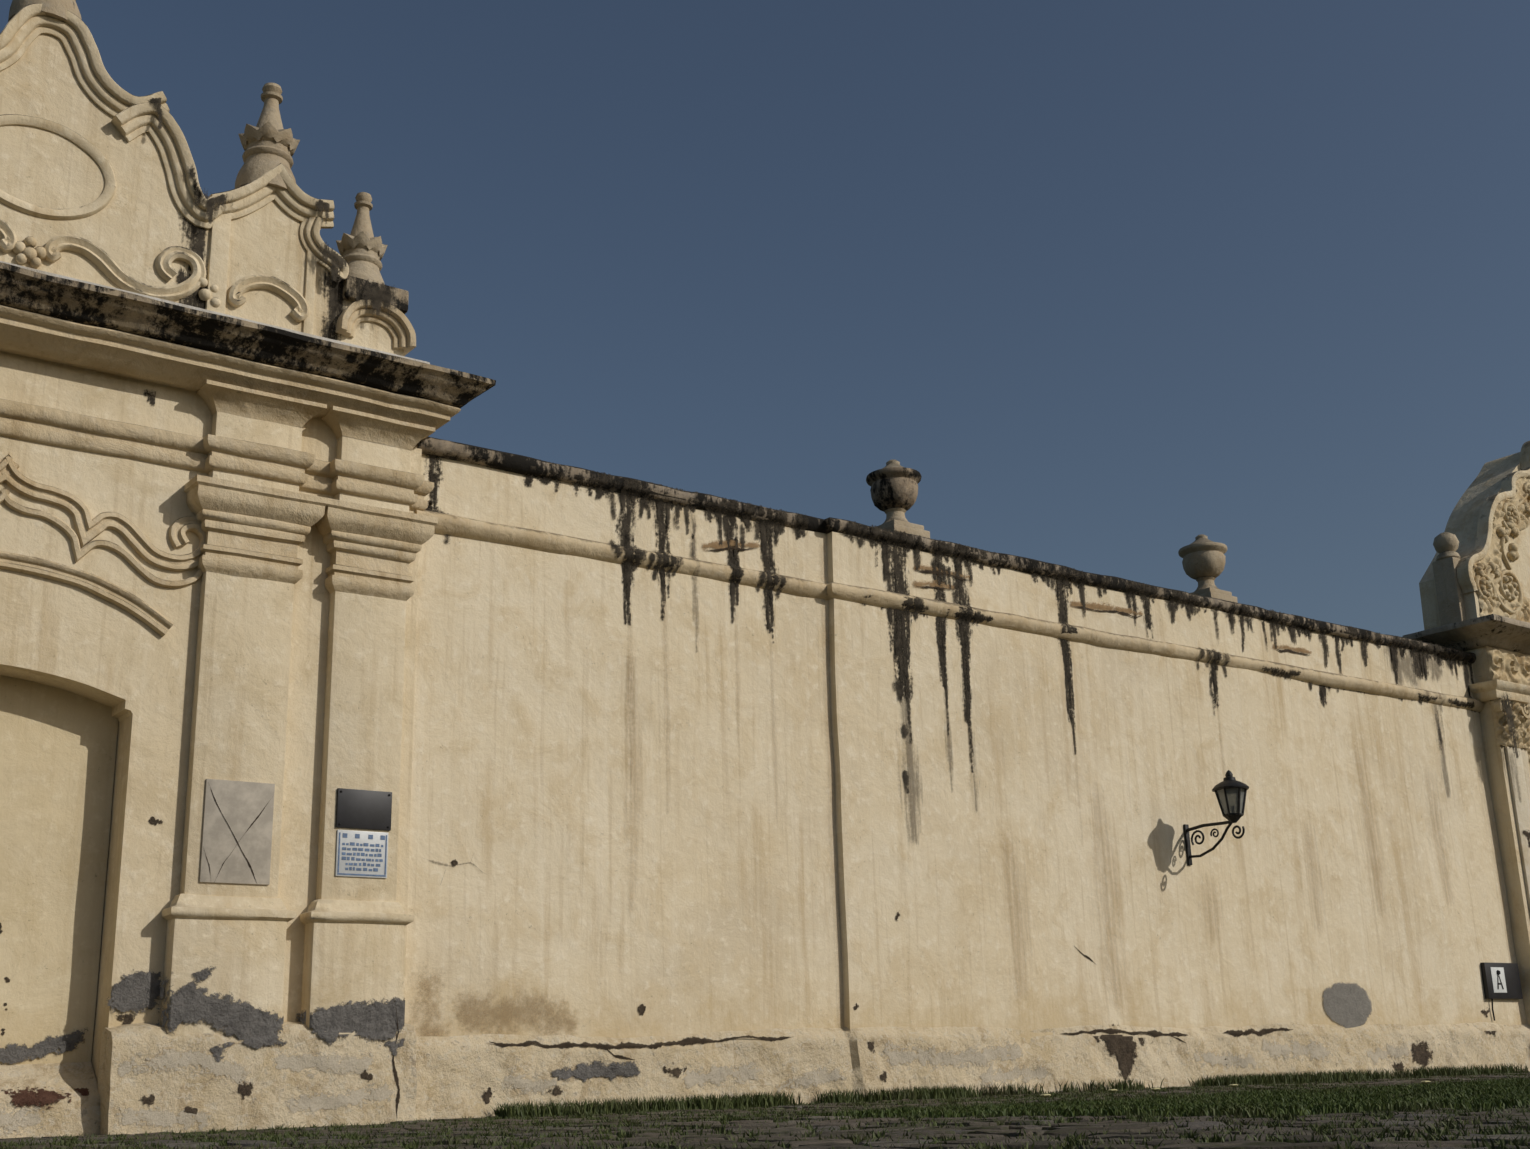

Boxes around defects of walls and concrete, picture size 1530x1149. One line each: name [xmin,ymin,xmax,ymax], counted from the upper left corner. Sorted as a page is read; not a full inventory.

water stain [177,166,230,309]
water stain [320,242,396,341]
water stain [524,460,809,643]
water stain [846,521,1005,772]
water stain [1031,560,1480,755]
peeling [193,966,216,983]
flaking render [0,1003,88,1065]
flaking render [2,1086,89,1109]
crack [392,1010,400,1114]
flaking render [546,1060,641,1096]
crack [489,1035,791,1060]
flaking render [1094,1024,1144,1082]